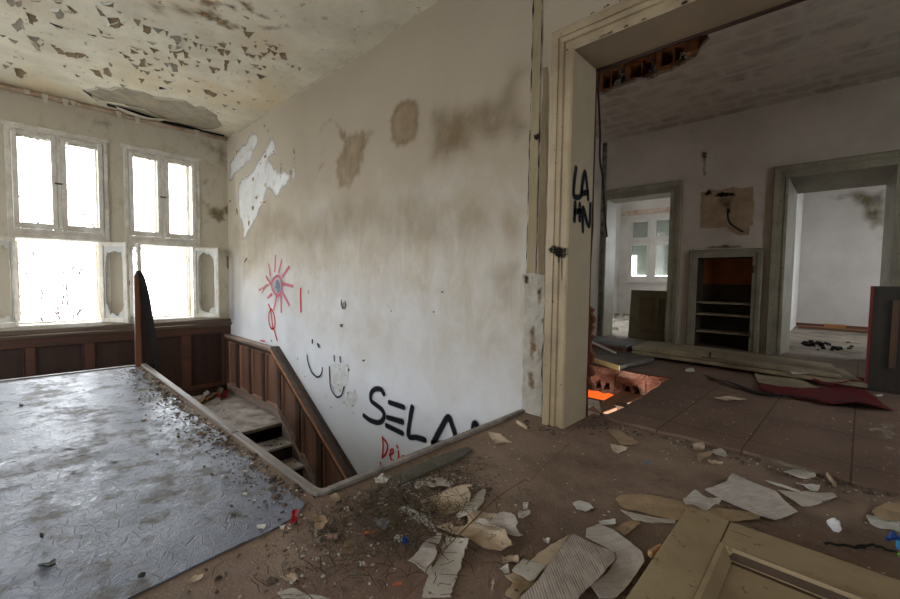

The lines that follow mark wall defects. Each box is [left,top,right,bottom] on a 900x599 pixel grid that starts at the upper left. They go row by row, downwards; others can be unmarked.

peeling [3,56,27,78]
peeling [0,0,89,68]
peeling [96,2,124,34]
spalling [83,16,301,129]
peeling [224,134,295,239]
leakage [854,193,882,223]
spalling [522,273,545,416]